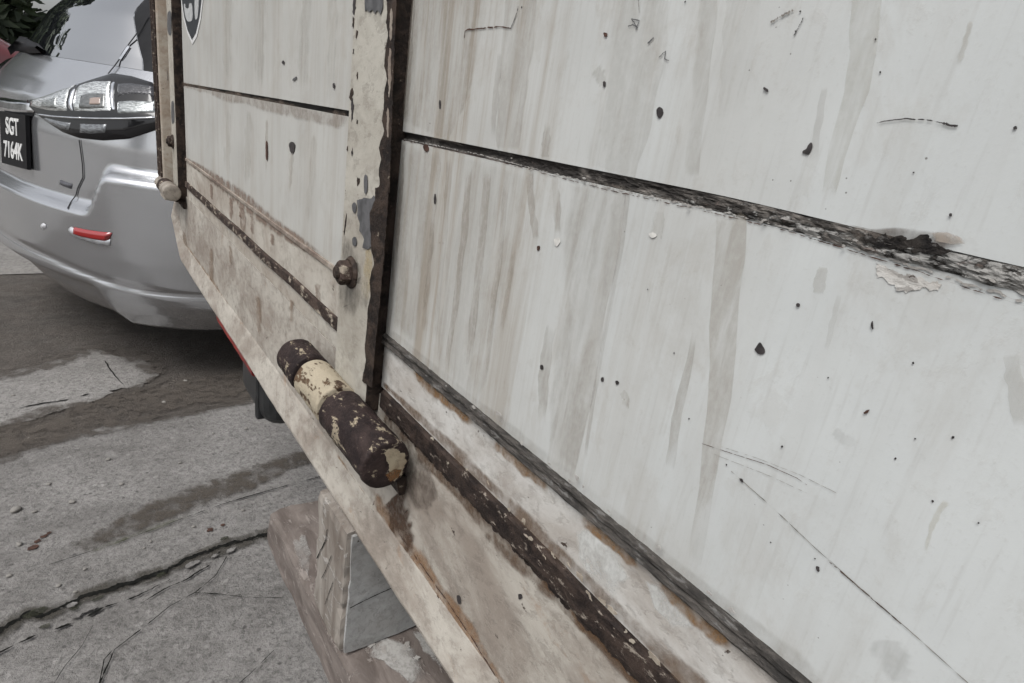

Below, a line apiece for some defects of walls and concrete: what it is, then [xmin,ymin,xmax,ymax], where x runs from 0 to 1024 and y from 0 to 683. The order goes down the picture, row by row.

peeling [344,0,397,388]
spalling [858,233,952,255]
peeling [889,269,918,291]
rust [416,373,469,422]
crack [0,533,267,653]
rust [377,494,476,646]
rust [384,415,555,598]
rust [510,500,572,565]
rust [587,525,635,565]
rust [574,618,639,683]
rust [649,647,705,683]